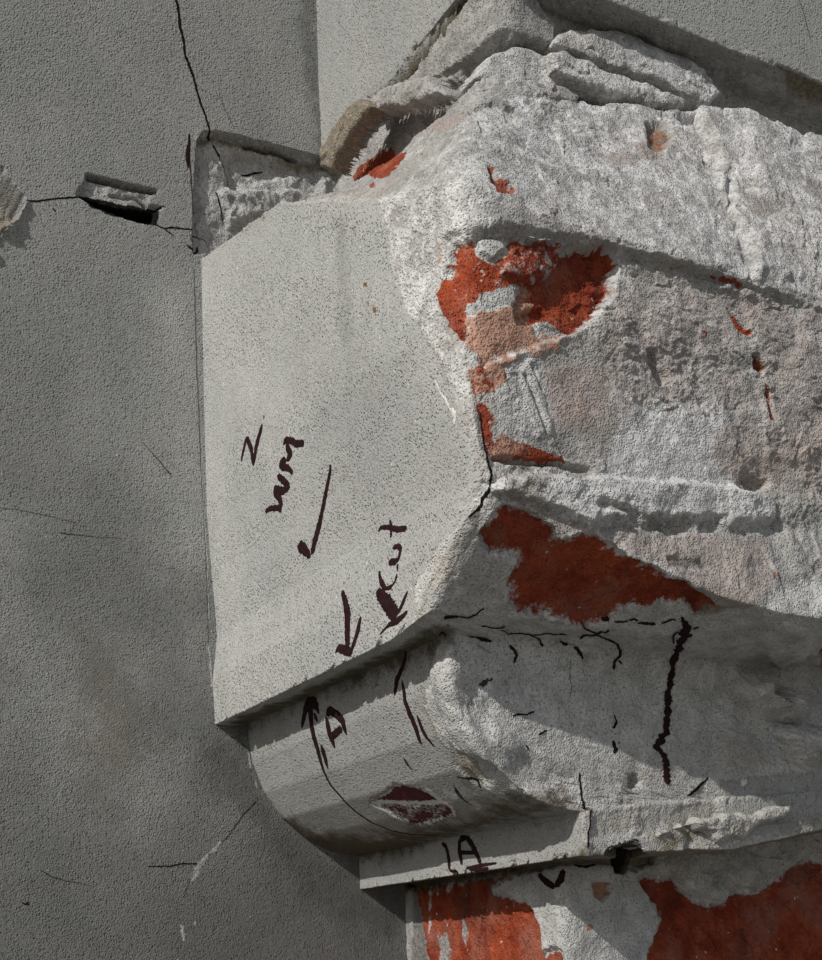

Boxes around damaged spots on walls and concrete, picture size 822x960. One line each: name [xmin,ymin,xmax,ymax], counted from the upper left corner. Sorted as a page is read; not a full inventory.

crack [175,0,262,222]
crack [19,196,78,212]
spalling [76,176,162,224]
crack [152,206,206,242]
spalling [192,0,822,628]
crack [468,412,493,518]
crack [439,608,708,796]
peeling [371,782,482,826]
crack [148,861,197,869]
peeling [491,843,662,960]